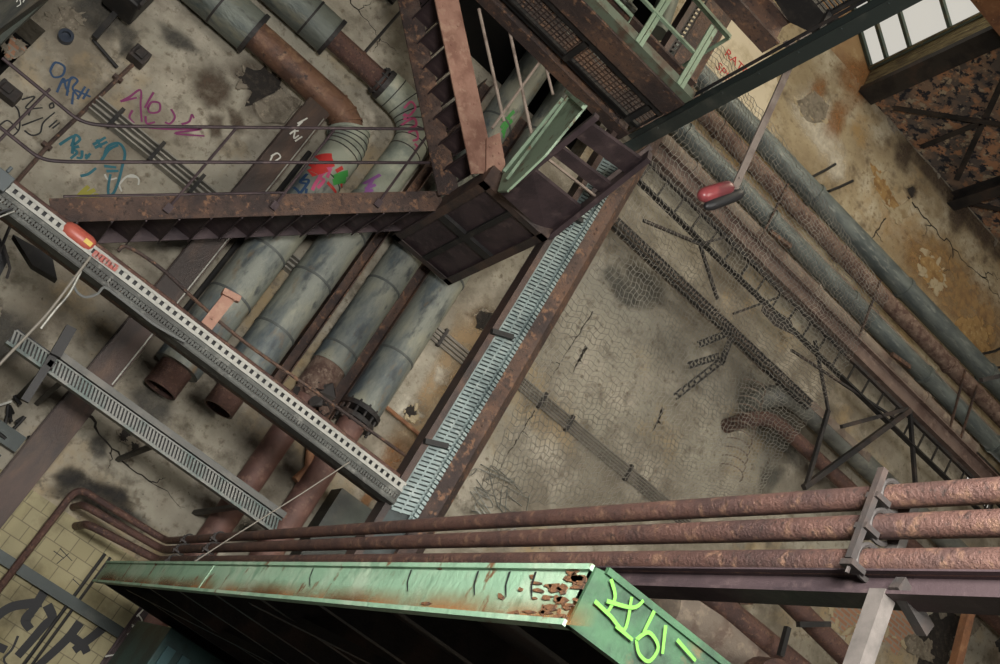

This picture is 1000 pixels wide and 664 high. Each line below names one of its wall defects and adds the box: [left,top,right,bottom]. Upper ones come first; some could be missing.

flaking render [793,88,829,125]
crack [907,197,1000,298]
flaking render [917,248,947,297]
crack [89,415,185,508]
corrosion [309,568,397,605]
corrosion [420,571,481,612]
corrosion [498,570,587,625]